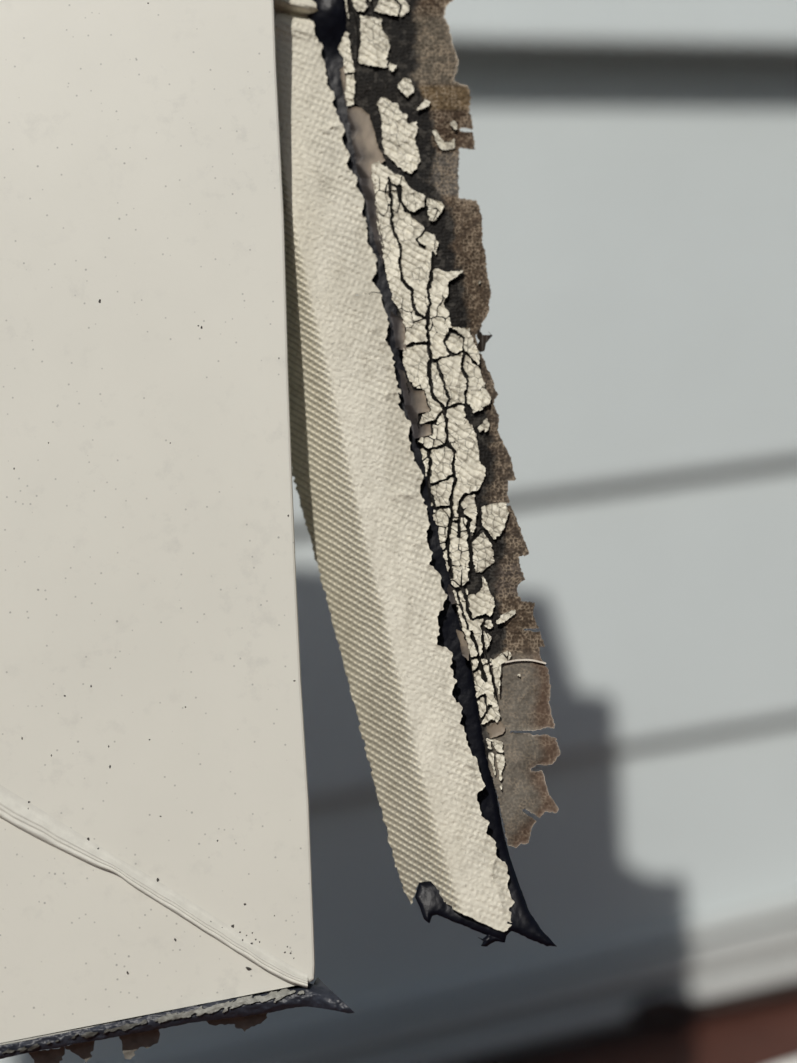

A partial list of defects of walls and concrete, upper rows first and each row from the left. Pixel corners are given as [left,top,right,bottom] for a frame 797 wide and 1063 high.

peeling [338,0,516,724]
peeling [486,738,505,790]